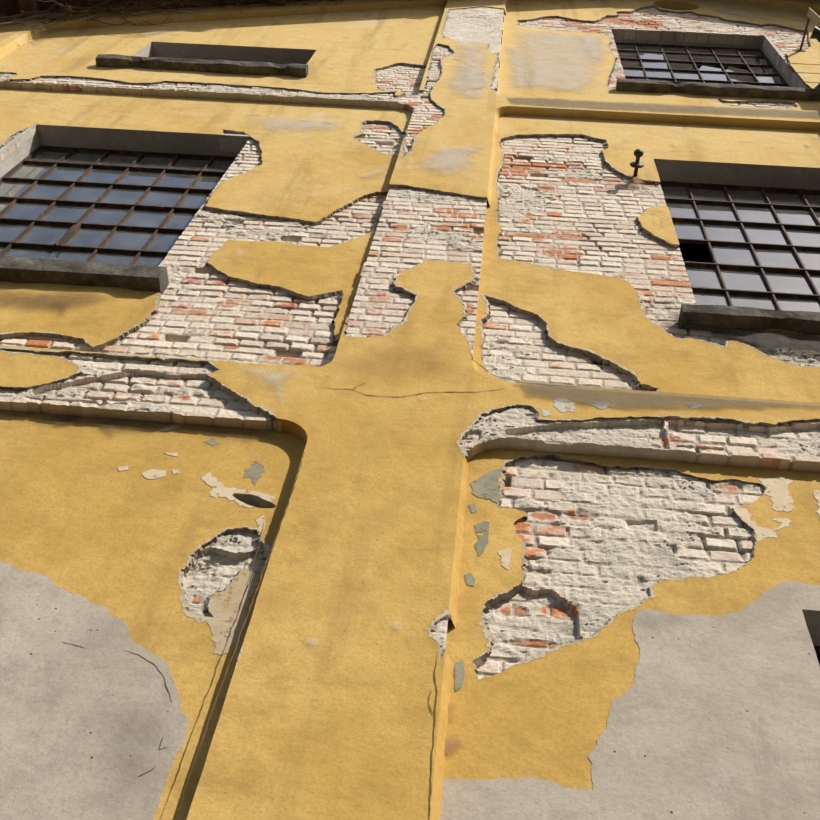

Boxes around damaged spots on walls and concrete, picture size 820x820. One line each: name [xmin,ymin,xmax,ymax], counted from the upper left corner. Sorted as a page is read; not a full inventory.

flaking render [0,6,504,162]
flaking render [516,5,811,89]
flaking render [715,97,798,109]
flaking render [0,129,820,432]
damp [694,323,820,351]
peeling [142,469,179,479]
flaking render [0,562,189,820]
flaking render [177,461,276,667]
flaking render [424,606,453,659]
flaking render [439,398,820,820]